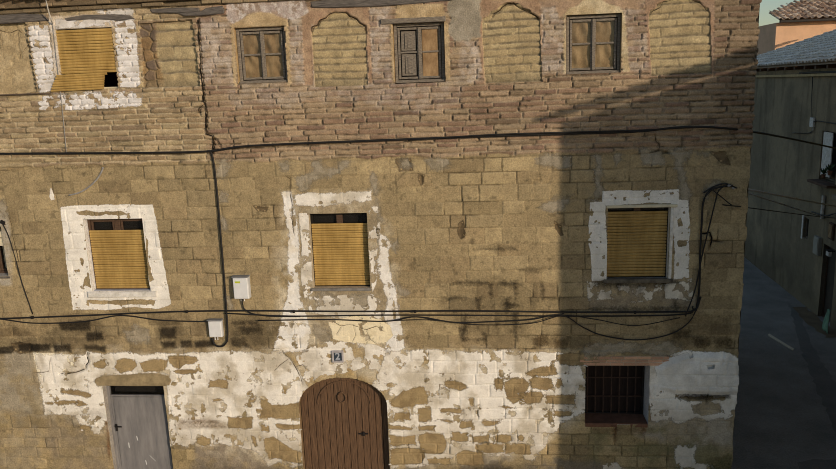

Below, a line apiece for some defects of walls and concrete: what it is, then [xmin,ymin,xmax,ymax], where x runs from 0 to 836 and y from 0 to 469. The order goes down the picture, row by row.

peeling [28,8,143,111]
peeling [587,189,693,303]
damp [0,345,70,353]
damp [60,322,105,351]
damp [160,328,213,348]
peeling [11,190,587,469]
peeling [649,350,737,424]
peeling [674,445,714,469]